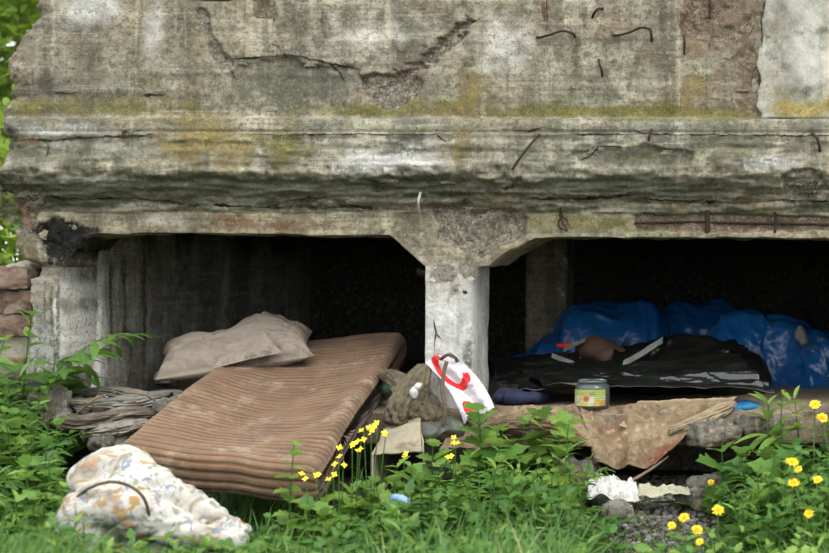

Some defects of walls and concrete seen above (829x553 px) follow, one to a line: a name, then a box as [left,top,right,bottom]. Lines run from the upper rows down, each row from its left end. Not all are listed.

spalling [196,9,331,80]
crack [230,43,360,82]
spalling [336,17,472,113]
crack [376,40,448,88]
peeling [682,0,766,117]
damp [170,115,253,162]
spalling [0,184,82,261]